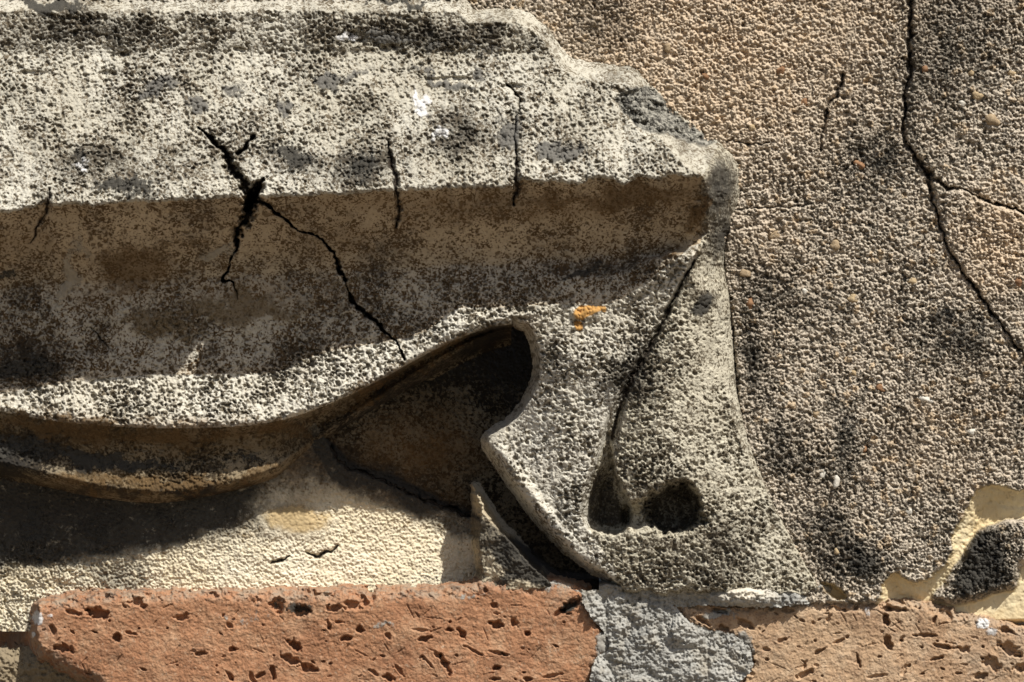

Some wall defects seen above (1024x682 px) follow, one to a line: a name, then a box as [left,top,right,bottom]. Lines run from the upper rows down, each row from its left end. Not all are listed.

crack [199,128,405,360]
crack [506,84,520,205]
crack [821,75,844,150]
crack [902,0,1024,351]
crack [611,260,694,439]
spalling [821,583,846,600]
spalling [876,485,1024,624]